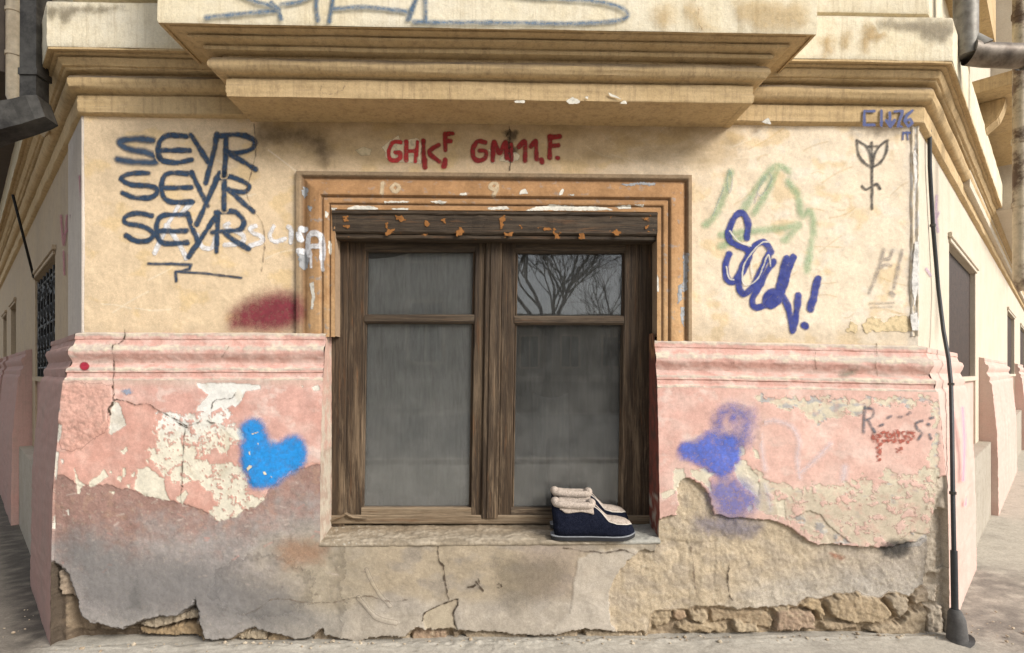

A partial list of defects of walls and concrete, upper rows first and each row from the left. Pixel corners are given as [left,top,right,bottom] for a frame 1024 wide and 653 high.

peeling [846,242,919,334]
crack [108,334,235,487]
crack [422,547,502,626]
spalling [50,382,949,646]